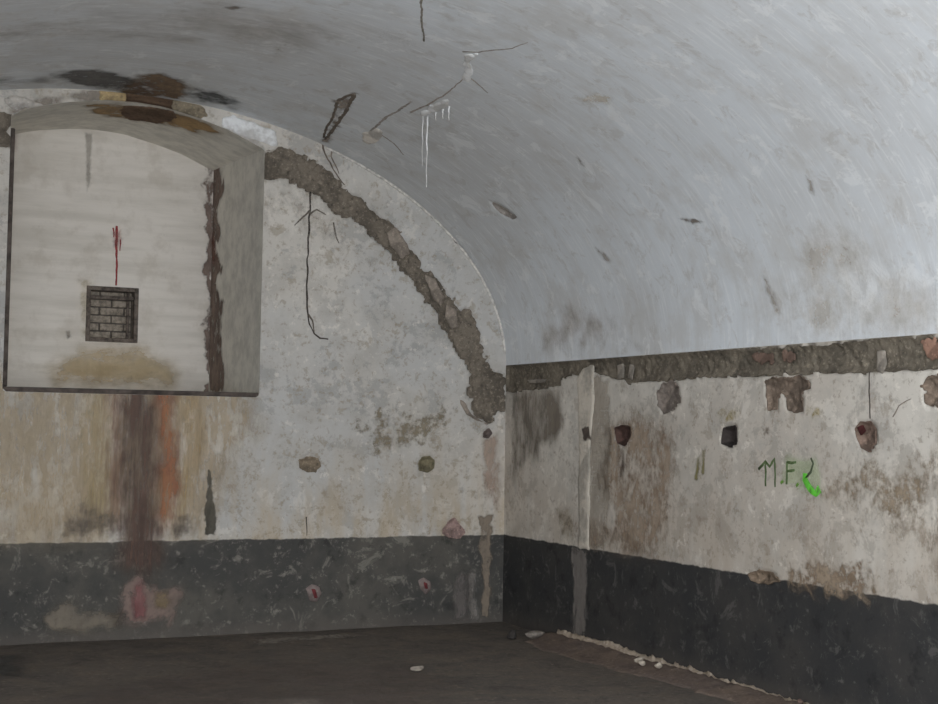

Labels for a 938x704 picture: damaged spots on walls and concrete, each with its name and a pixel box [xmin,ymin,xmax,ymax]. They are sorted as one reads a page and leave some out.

crack [418,0,426,42]
flaking render [0,95,43,148]
crack [322,93,356,185]
crack [362,42,528,155]
flaking render [264,147,938,439]
damp [0,377,249,536]
rust [90,394,188,574]
peeling [356,407,445,453]
damp [513,393,561,459]
damp [589,418,671,552]
peeling [44,575,184,633]
damp [571,546,587,635]